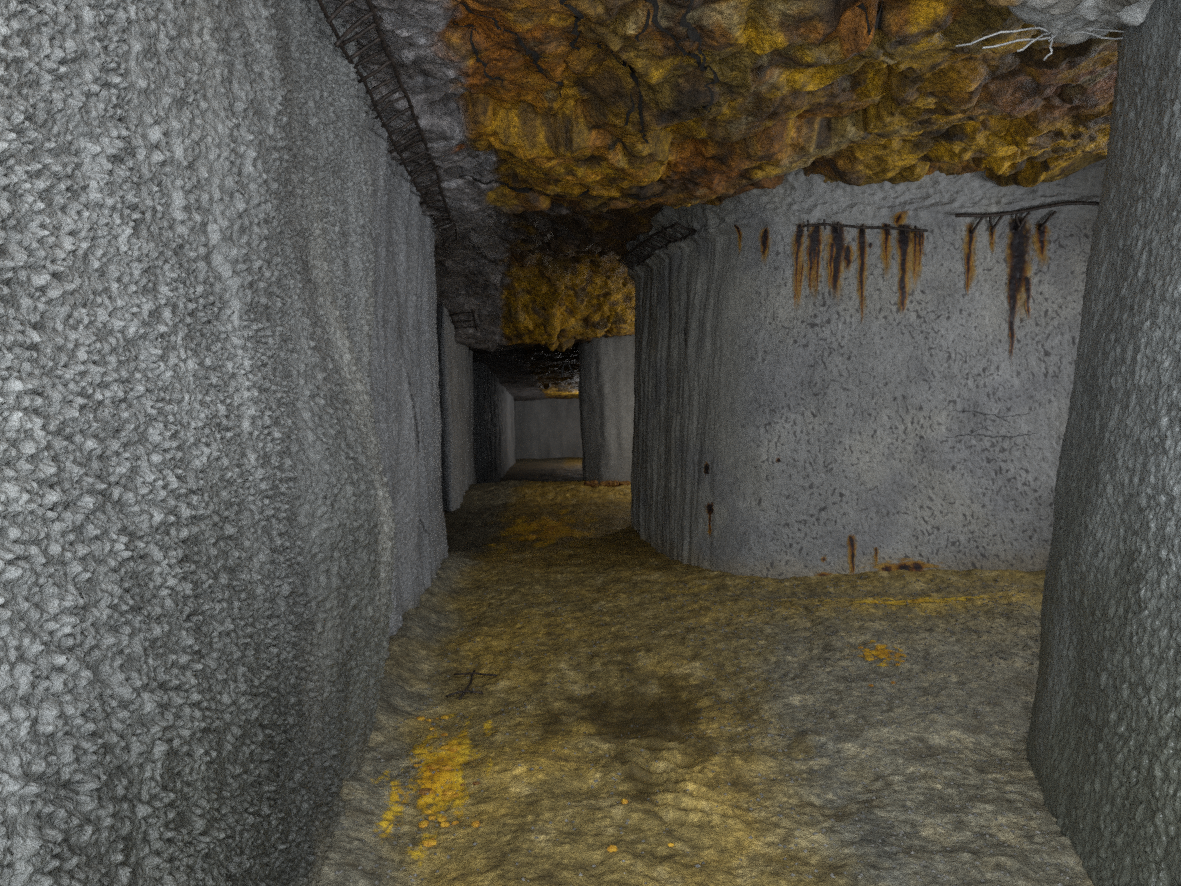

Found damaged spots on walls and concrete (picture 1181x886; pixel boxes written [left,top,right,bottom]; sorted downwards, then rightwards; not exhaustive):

rust [793,211,925,317]
rust [963,220,1047,356]
rust [848,536,938,574]